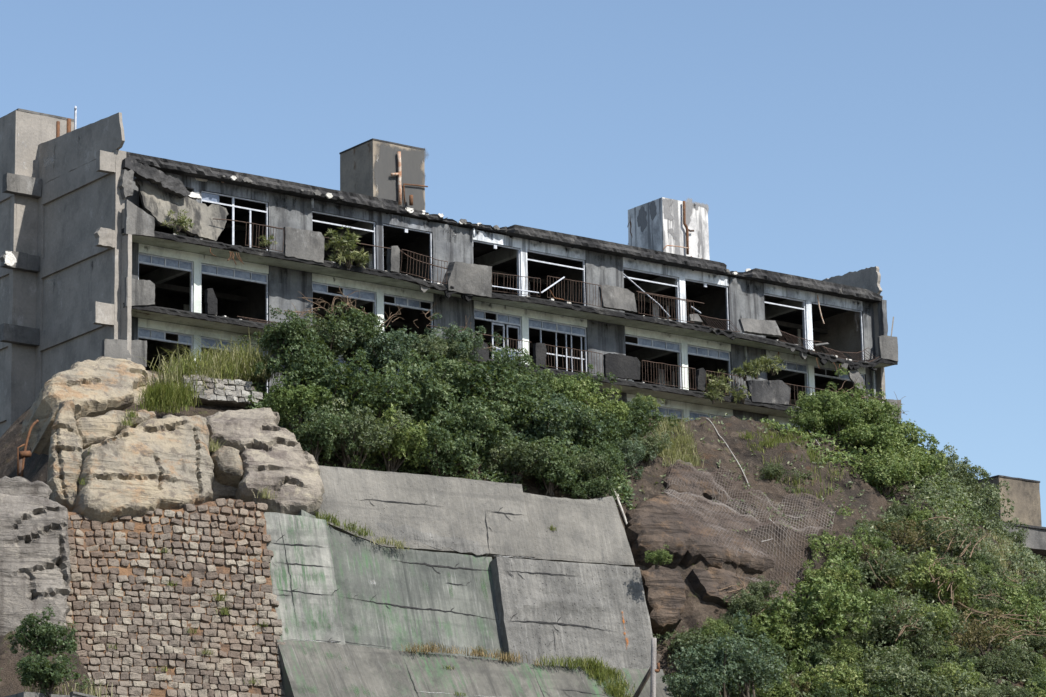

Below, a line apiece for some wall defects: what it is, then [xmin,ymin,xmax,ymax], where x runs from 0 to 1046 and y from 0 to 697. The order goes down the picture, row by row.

spalling [195,175,253,183]